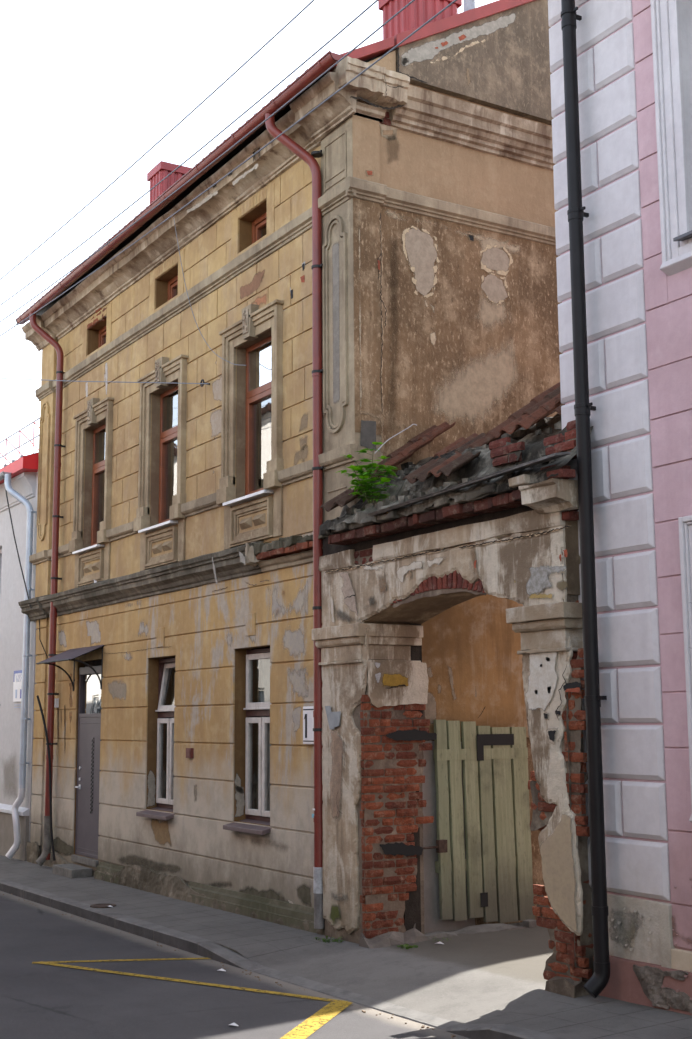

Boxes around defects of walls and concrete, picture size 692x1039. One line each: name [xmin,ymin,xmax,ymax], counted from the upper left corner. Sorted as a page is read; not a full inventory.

spalling [430,34,485,63]
spalling [340,548,381,615]
spalling [390,543,486,607]
peeling [514,548,579,603]
spalling [525,648,590,837]
spalling [360,692,437,939]
leakage [120,856,180,872]
leakage [211,882,285,902]
leakage [297,885,311,906]
spalling [532,884,594,985]
peeling [608,908,651,951]
spalling [633,965,692,1014]